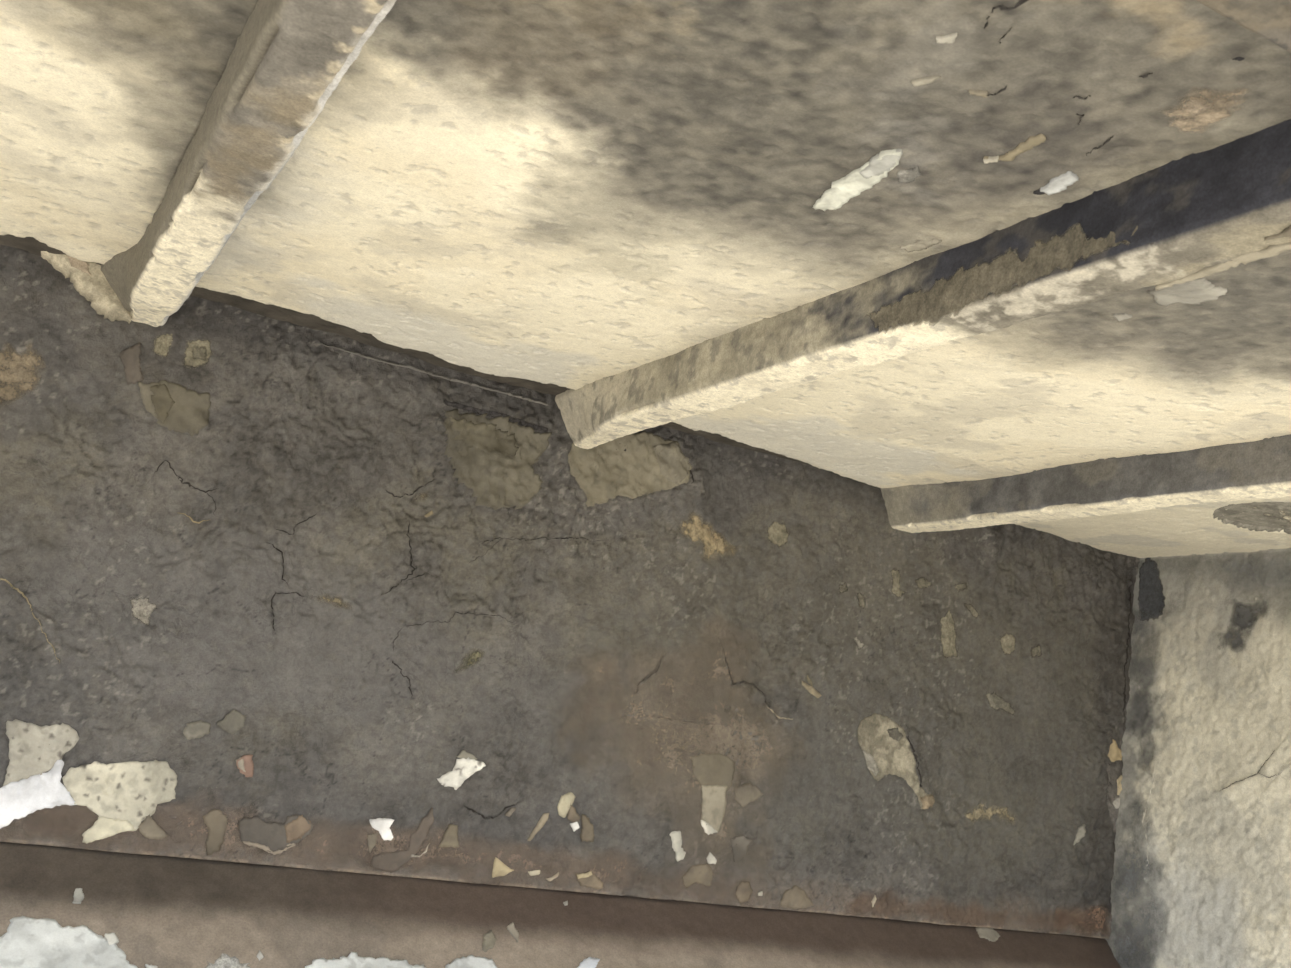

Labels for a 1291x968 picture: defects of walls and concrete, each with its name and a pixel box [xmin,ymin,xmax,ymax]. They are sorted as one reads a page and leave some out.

peeling [813,149,921,211]
crack [153,460,218,514]
peeling [443,409,552,510]
peeling [568,431,693,507]
crack [269,513,317,634]
crack [381,479,437,595]
leakage [1135,557,1165,621]
leakage [1223,604,1266,650]
peeling [0,719,177,844]
peeling [437,750,486,790]
spalling [858,713,935,809]
leakage [1113,806,1163,968]